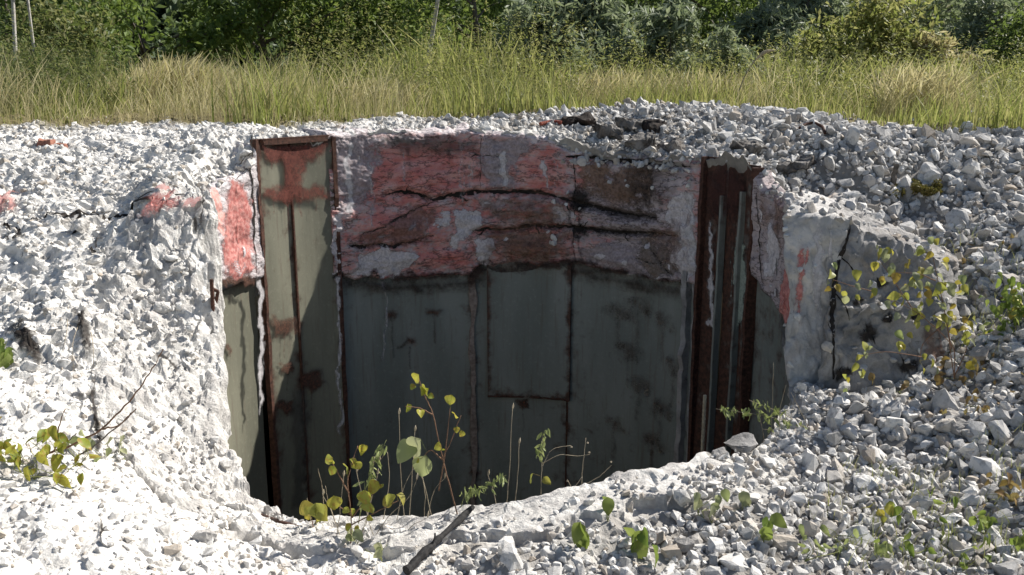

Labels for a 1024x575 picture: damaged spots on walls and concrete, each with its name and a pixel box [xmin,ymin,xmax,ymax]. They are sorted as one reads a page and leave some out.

peeling [143,179,255,281]
rust [264,144,328,213]
peeling [330,136,382,275]
peeling [352,243,420,279]
peeling [433,209,508,265]
peeling [478,136,529,189]
crack [349,138,690,267]
spalling [578,157,652,206]
peeling [578,192,697,281]
rust [706,170,744,219]
peeling [759,209,809,322]
crack [828,226,860,379]